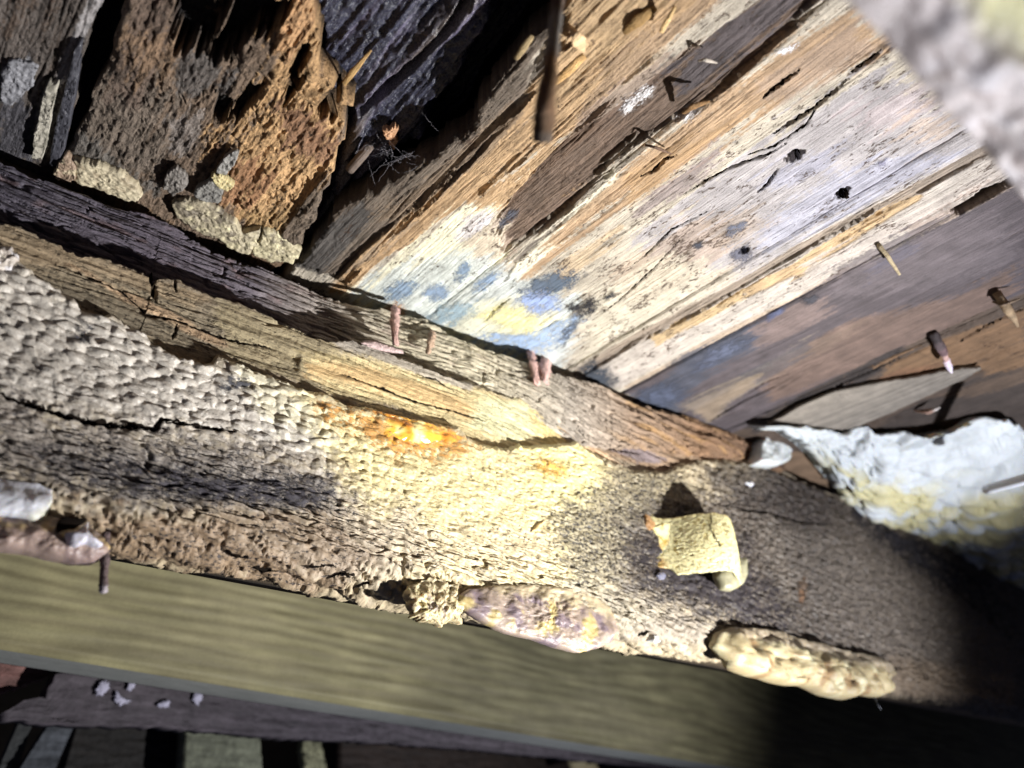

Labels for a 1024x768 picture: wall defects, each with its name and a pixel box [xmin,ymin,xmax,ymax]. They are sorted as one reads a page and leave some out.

crack [683,49,882,195]
crack [0,392,237,432]
peeling [649,512,748,591]